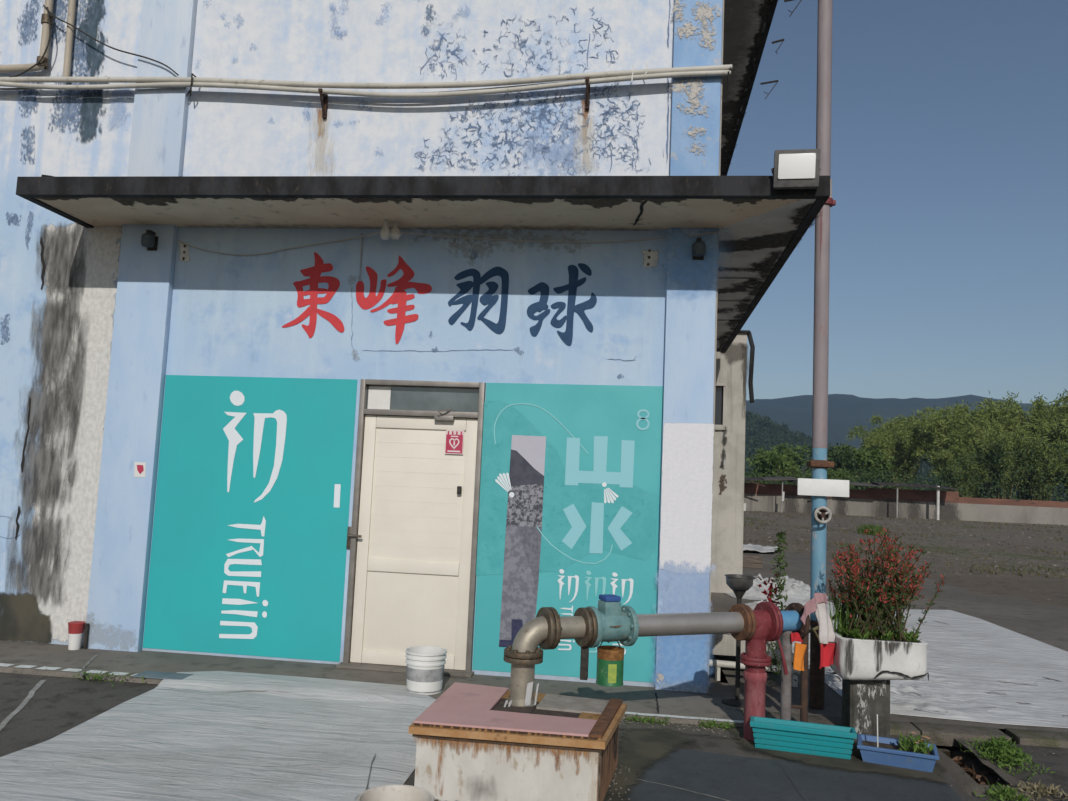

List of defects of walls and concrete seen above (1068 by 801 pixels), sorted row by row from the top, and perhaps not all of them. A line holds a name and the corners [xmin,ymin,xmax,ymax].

leakage [77,0,108,143]
peeling [422,4,466,67]
peeling [445,86,634,176]
crack [415,7,669,175]
crack [665,0,673,47]
peeling [669,78,713,155]
peeling [672,0,720,50]
leakage [720,0,772,176]
crack [629,200,647,226]
leakage [668,204,820,401]
leakage [0,224,85,644]
rust [422,725,619,801]